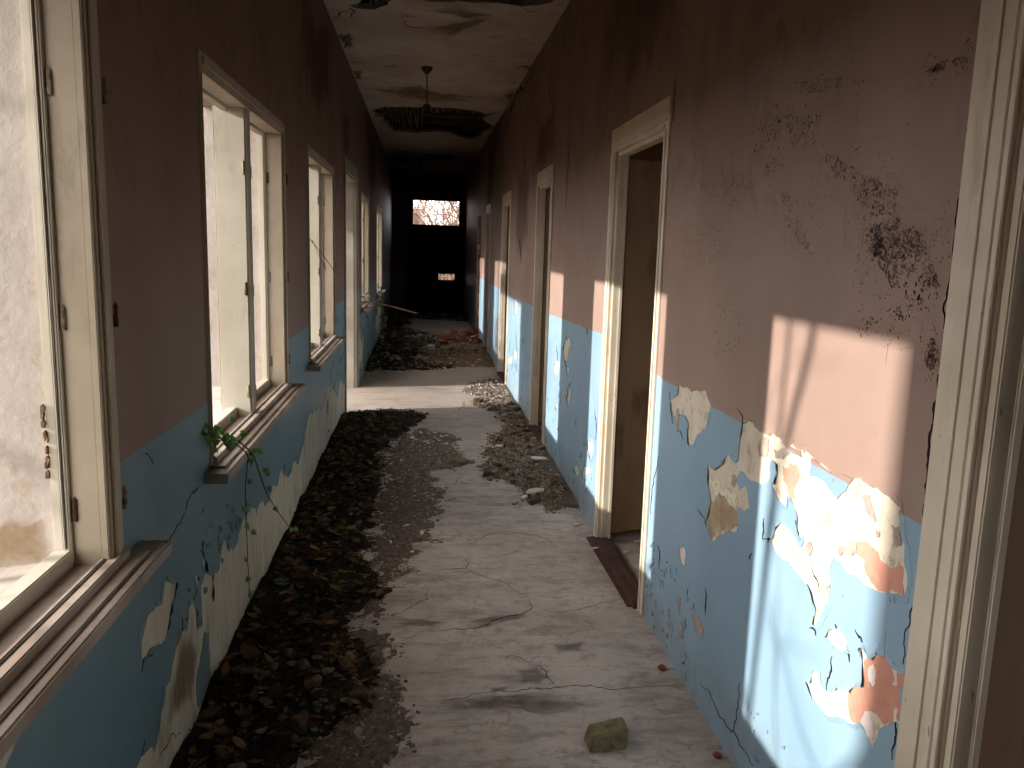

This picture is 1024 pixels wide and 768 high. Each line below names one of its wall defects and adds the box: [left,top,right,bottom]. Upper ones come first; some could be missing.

spalling [369,106,500,140]
damp [676,50,951,383]
crack [169,486,199,540]
peeling [137,330,346,768]
crack [405,531,610,640]
peeling [545,335,572,456]
peeling [567,419,595,503]
peeling [645,541,704,652]
peeling [669,385,711,449]
peeling [698,410,912,747]
crack [437,655,666,708]
crack [700,683,753,766]